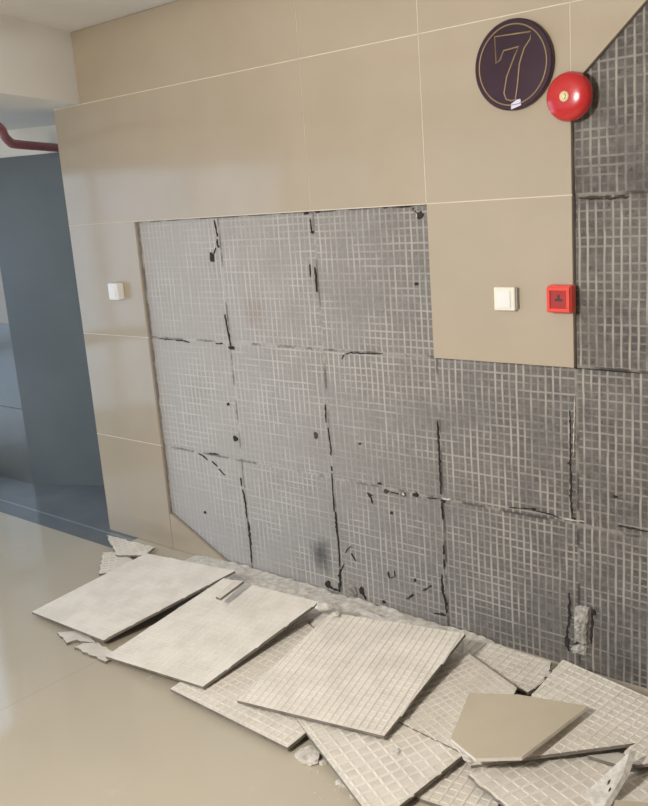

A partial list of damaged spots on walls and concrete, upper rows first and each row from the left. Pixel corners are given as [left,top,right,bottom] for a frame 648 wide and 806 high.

spalling [216,580,244,601]